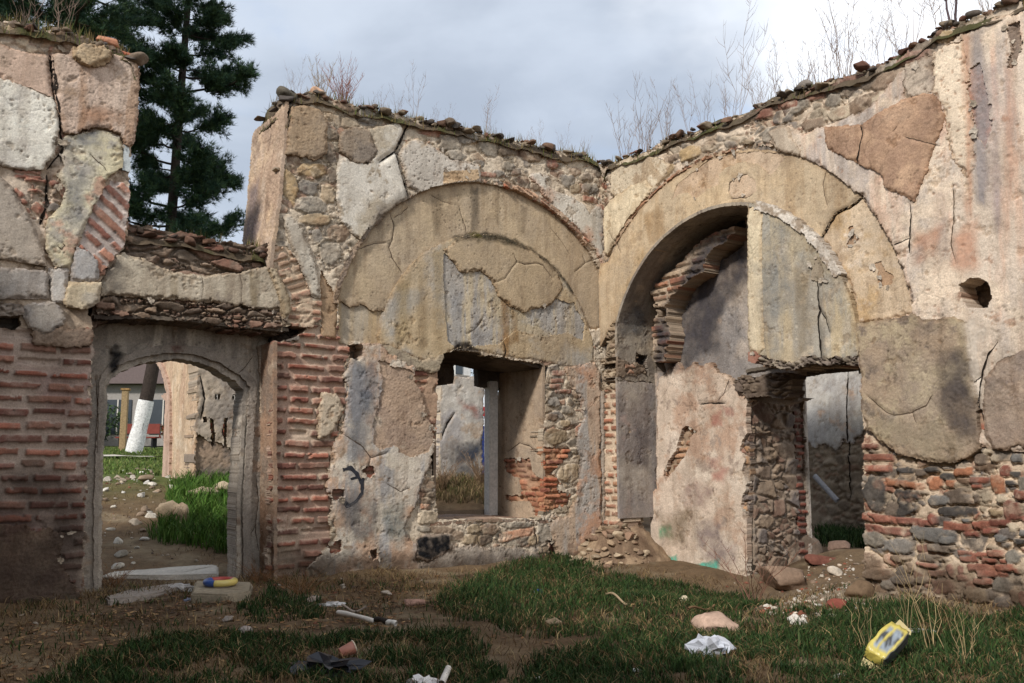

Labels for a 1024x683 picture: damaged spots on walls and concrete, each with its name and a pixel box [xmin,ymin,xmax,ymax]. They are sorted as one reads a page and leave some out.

crack [39,55,64,225]
spalling [272,1,1024,292]
leakage [974,56,986,202]
spalling [327,540,341,557]
spalling [328,487,345,504]
spalling [409,364,585,554]
spalling [665,427,696,476]
crack [817,280,830,358]
spalling [861,435,1024,610]
crack [974,342,998,421]